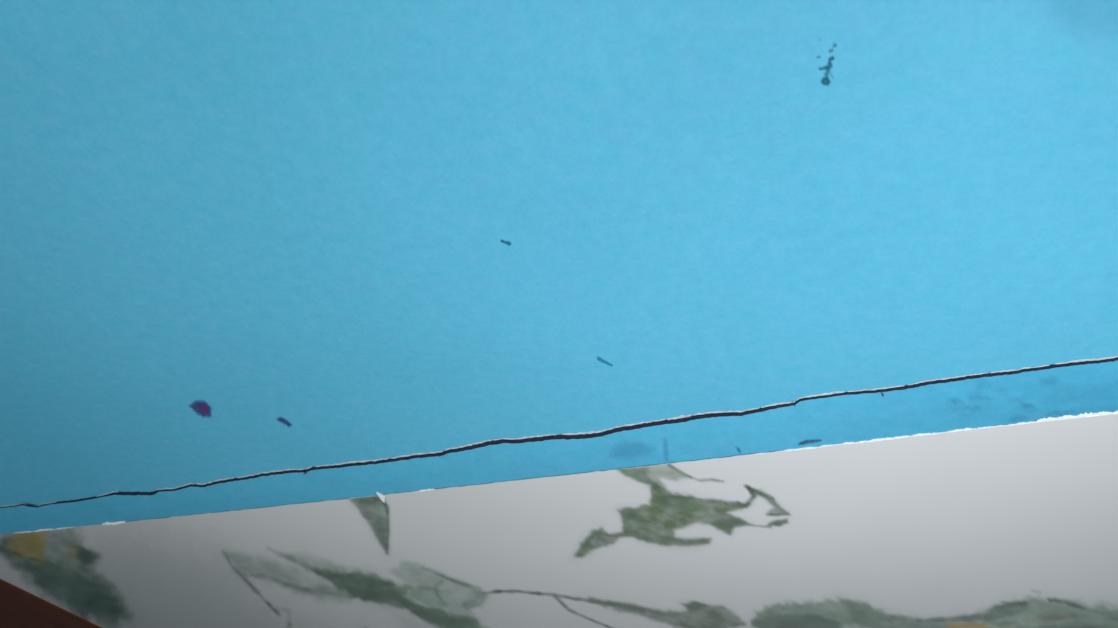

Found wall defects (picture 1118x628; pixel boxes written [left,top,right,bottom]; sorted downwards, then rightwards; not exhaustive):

crack [0,355,1118,508]